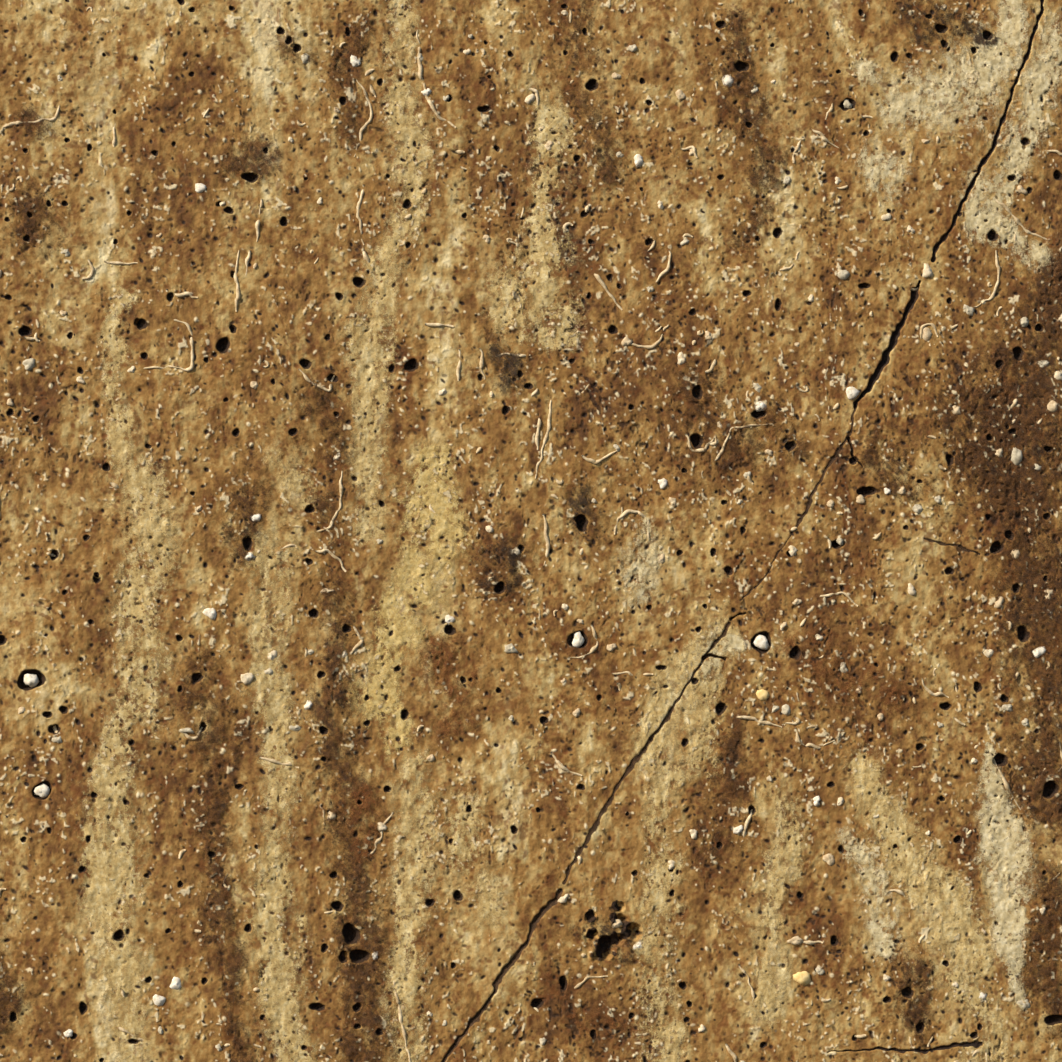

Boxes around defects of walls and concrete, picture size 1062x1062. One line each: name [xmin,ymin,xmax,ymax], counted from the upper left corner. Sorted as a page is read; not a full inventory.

leakage [14,106,60,143]
leakage [481,0,623,394]
leakage [712,9,788,251]
leakage [77,0,529,1062]
leakage [566,485,605,544]
leakage [619,517,660,606]
leakage [669,358,807,479]
crack [442,0,1044,1062]
leakage [838,0,1062,1062]
leakage [0,936,26,1032]
leakage [573,617,749,1062]
leakage [750,777,806,1029]